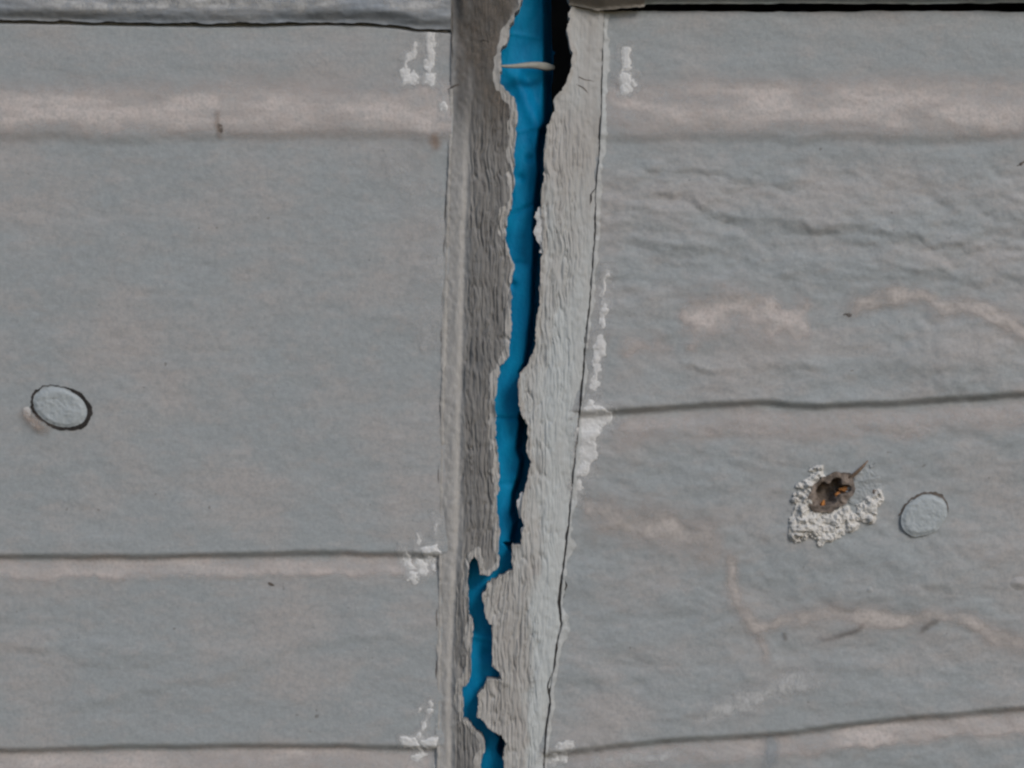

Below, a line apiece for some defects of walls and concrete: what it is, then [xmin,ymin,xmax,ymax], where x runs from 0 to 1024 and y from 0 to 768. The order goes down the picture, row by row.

crack [435,0,610,768]
spalling [808,463,883,513]